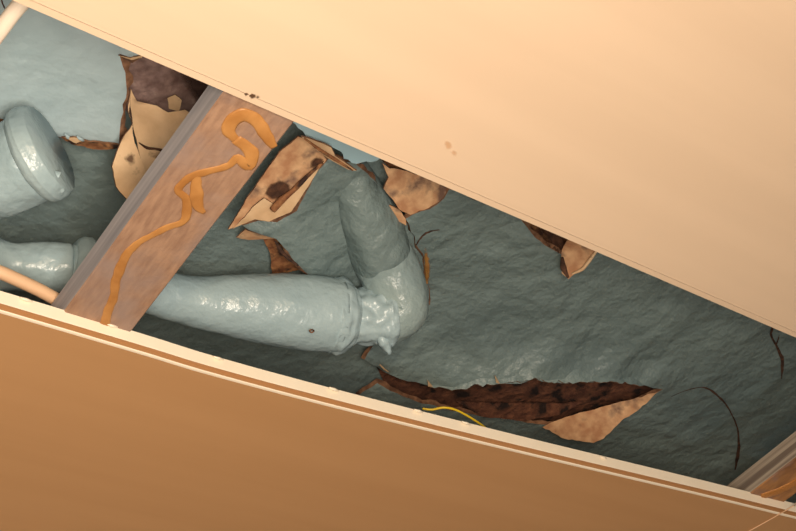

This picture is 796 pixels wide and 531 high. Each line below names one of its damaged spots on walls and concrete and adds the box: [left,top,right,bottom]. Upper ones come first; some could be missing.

peeling [228,122,796,486]
crack [770,327,784,379]
crack [671,387,741,470]